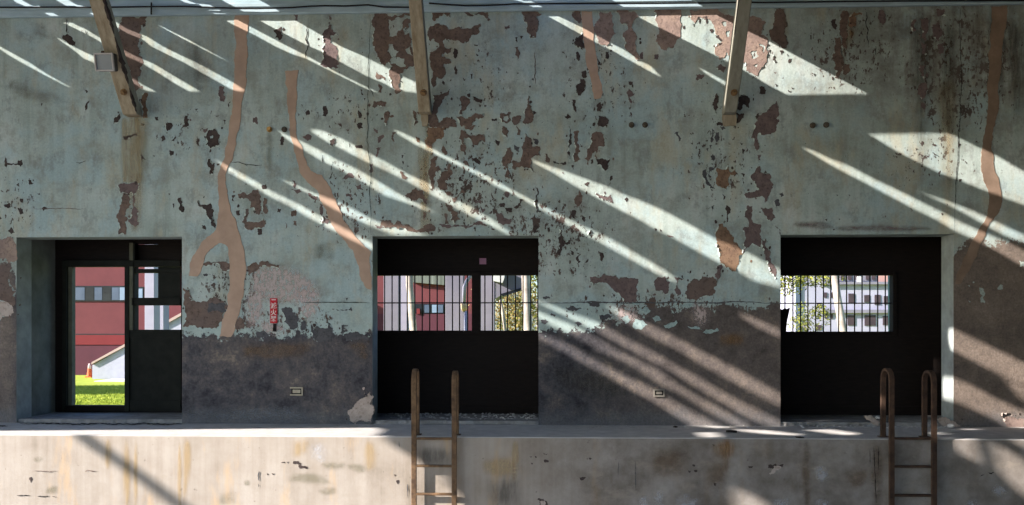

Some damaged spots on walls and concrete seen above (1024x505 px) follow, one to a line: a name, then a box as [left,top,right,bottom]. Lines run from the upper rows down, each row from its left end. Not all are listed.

peeling [318,16,340,73]
peeling [829,11,863,80]
peeling [348,13,414,173]
peeling [375,8,793,334]
peeling [116,181,139,235]
peeling [203,261,230,276]
peeling [182,287,228,329]
spalling [346,387,375,424]